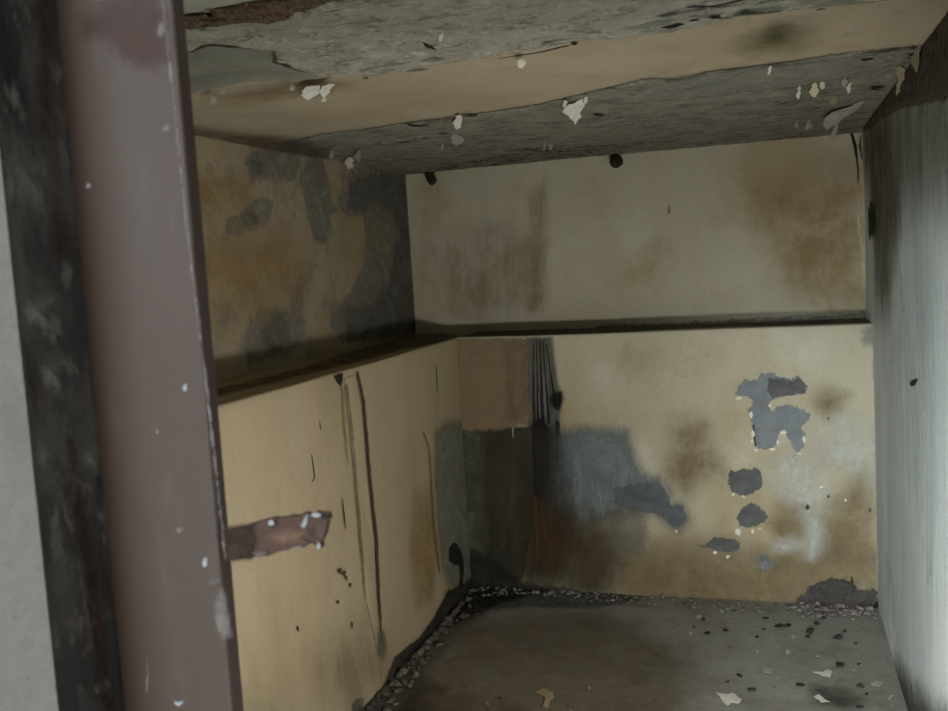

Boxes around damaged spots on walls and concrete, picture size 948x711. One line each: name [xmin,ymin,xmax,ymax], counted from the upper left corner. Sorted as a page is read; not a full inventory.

flaking render [183,0,884,105]
damp [195,132,324,156]
damp [780,96,948,573]
peeling [735,372,810,455]
rust [222,524,255,562]
damp [216,318,894,711]
peeling [552,429,686,533]
peeling [699,467,768,558]
damp [896,670,929,711]